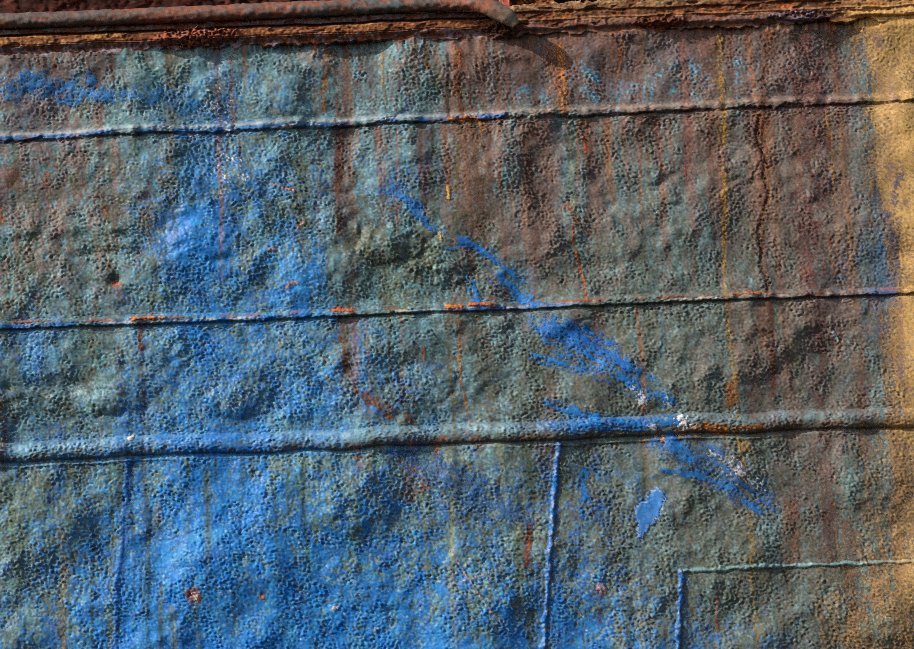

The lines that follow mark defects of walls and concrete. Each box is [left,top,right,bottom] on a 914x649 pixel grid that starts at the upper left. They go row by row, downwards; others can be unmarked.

corrosion [486,20,520,40]
corrosion [535,38,577,114]
corrosion [617,14,687,72]
corrosion [319,49,345,235]
corrosion [445,42,493,248]
corrosion [757,7,839,410]
corrosion [571,223,588,301]
corrosion [129,315,166,353]
corrosion [332,306,415,424]
corrosion [185,588,201,649]